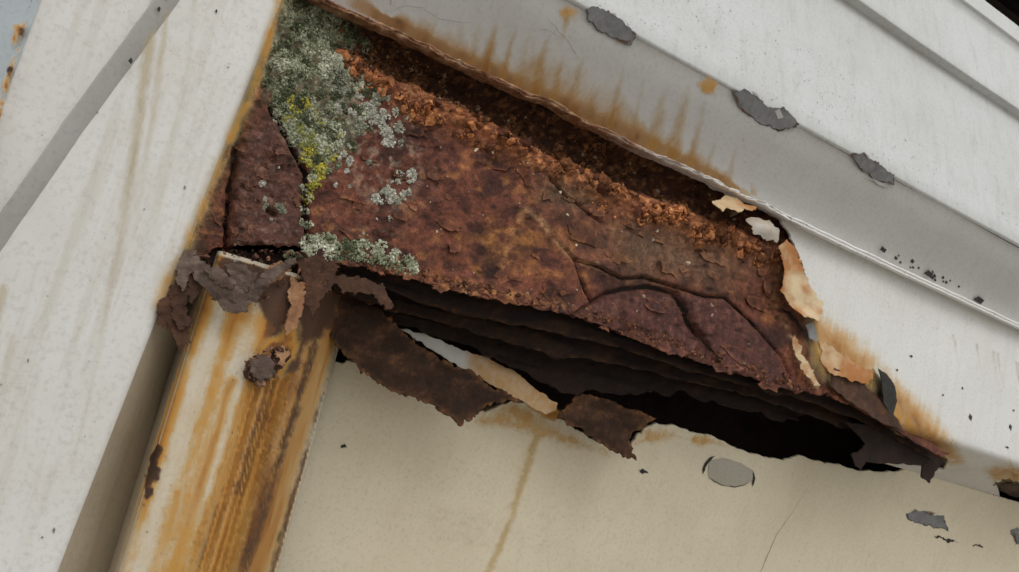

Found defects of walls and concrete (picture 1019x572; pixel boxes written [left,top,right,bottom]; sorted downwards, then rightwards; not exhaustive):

peeling [586,6,636,46]
corrosion [0,23,26,117]
peeling [731,89,799,132]
peeling [850,152,895,187]
corrosion [156,0,958,572]
peeling [712,195,874,386]
corrosion [136,291,214,520]
peeling [703,456,755,487]
corrosion [992,468,1019,500]
peeling [906,509,958,543]